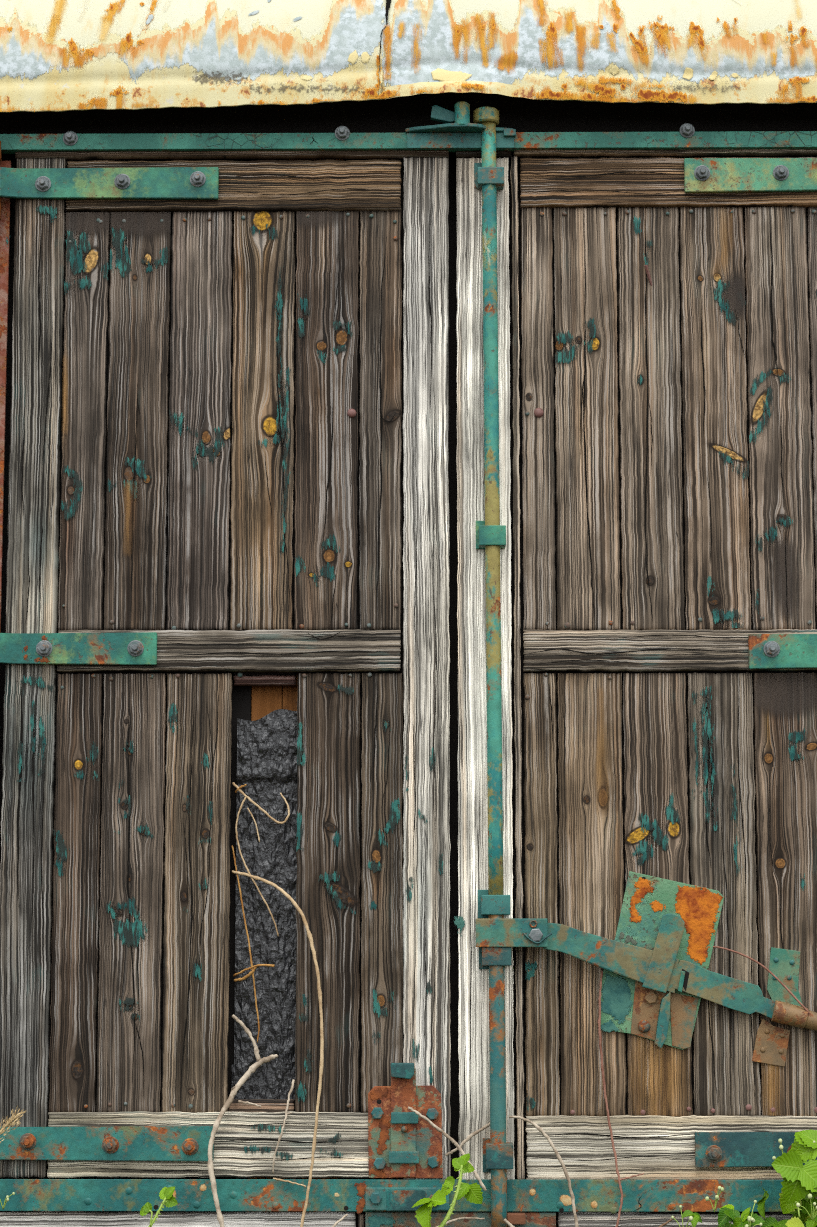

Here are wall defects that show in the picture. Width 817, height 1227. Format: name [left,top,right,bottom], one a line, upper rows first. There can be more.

corrosion [47,0,94,67]
corrosion [101,0,125,39]
corrosion [79,85,151,109]
corrosion [119,31,144,55]
crack [378,0,391,96]
corrosion [364,22,433,99]
peeling [0,0,817,86]
corrosion [453,12,518,72]
corrosion [532,0,705,104]
corrosion [770,11,817,103]
corrosion [629,877,723,965]
corrosion [354,1119,390,1214]